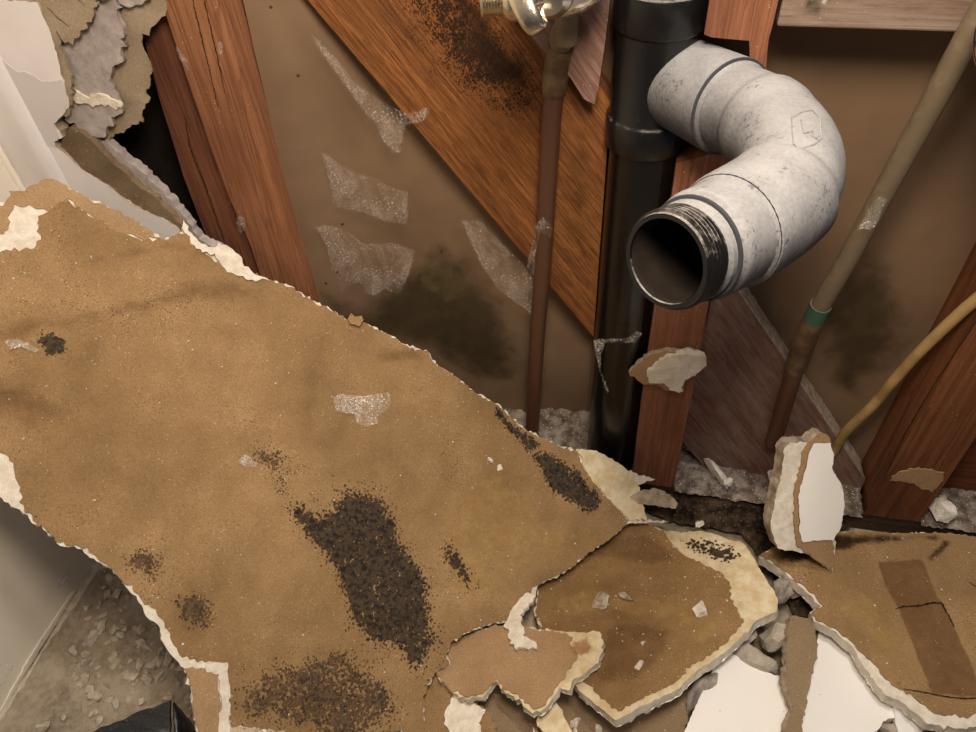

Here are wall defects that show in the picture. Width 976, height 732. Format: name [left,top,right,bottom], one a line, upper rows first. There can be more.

leakage [398,0,541,121]
spalling [2,60,189,230]
leakage [369,266,501,372]
leakage [230,436,445,732]
leakage [439,539,479,595]
crack [895,602,955,627]